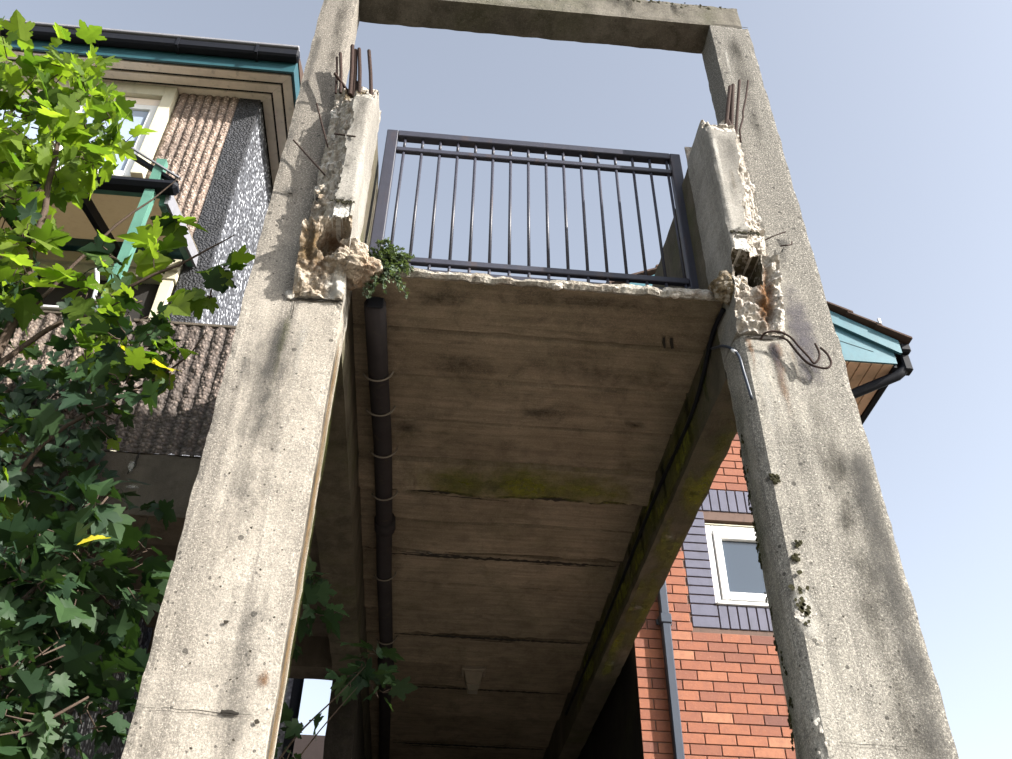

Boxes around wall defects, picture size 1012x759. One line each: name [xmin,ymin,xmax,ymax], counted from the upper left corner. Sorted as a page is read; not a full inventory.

spalling [285,86,785,336]
spalling [788,570,817,629]
crack [147,707,250,716]